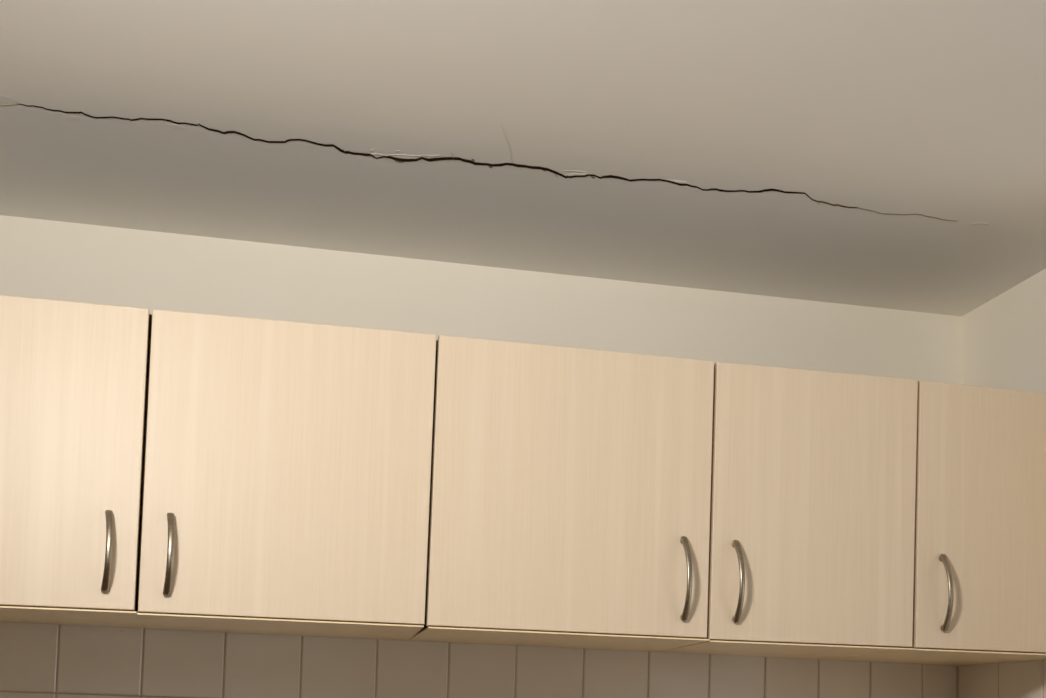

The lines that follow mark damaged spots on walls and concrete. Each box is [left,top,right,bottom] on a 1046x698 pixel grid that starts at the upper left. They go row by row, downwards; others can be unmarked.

crack [0,103,956,221]